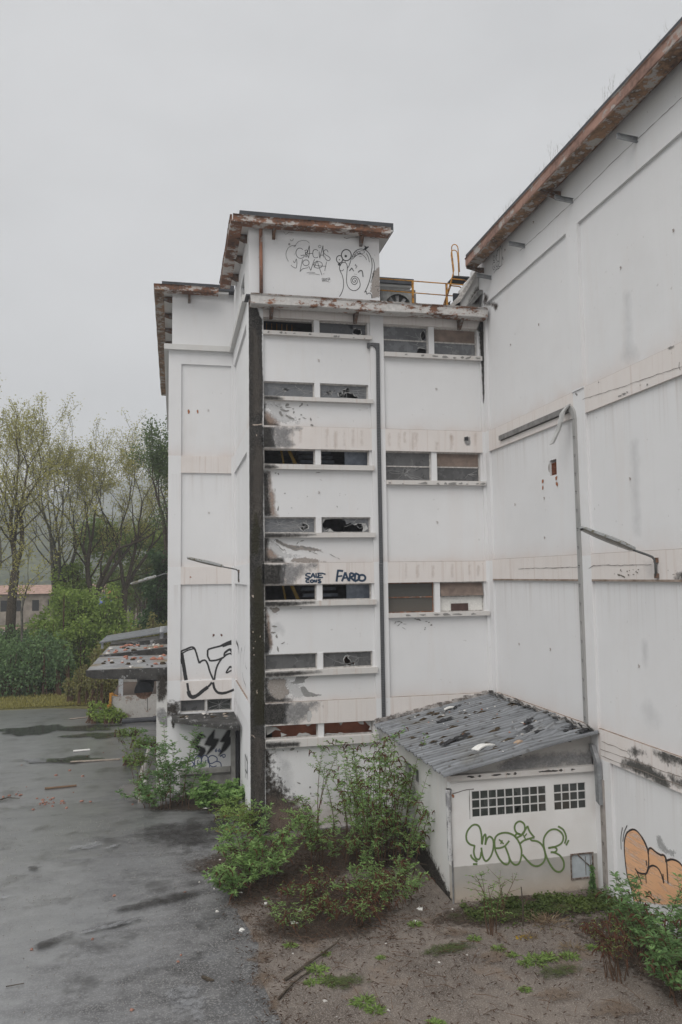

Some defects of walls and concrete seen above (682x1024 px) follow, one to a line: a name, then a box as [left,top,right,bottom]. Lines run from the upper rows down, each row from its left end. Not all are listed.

peeling [275,523,339,559]
leakage [622,748,682,788]